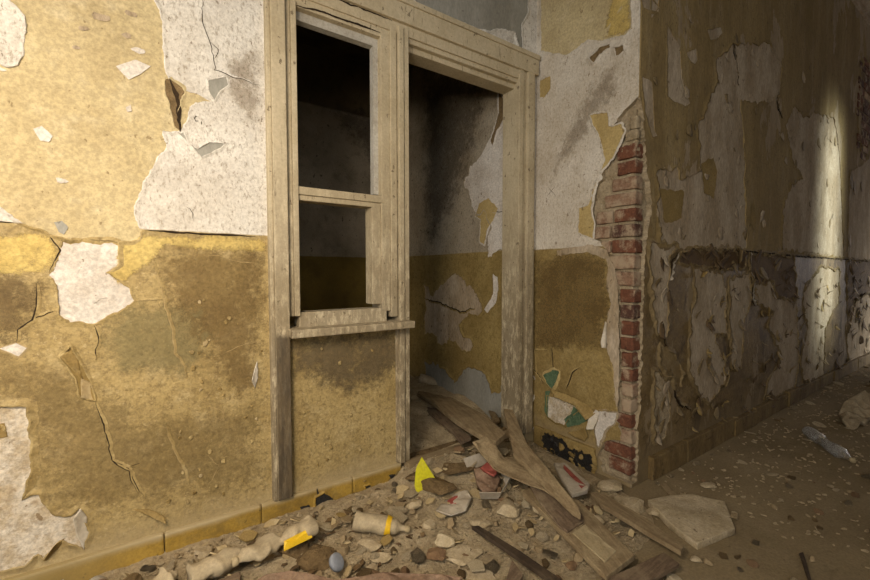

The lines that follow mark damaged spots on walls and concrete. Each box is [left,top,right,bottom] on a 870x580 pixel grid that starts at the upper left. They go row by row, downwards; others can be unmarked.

peeling [414,0,660,59]
crack [16,237,61,343]
crack [94,325,103,360]
peeling [0,0,231,328]
peeling [423,270,501,420]
peeling [463,93,503,259]
peeling [532,24,870,476]
peeling [0,397,95,576]
crack [96,401,145,498]